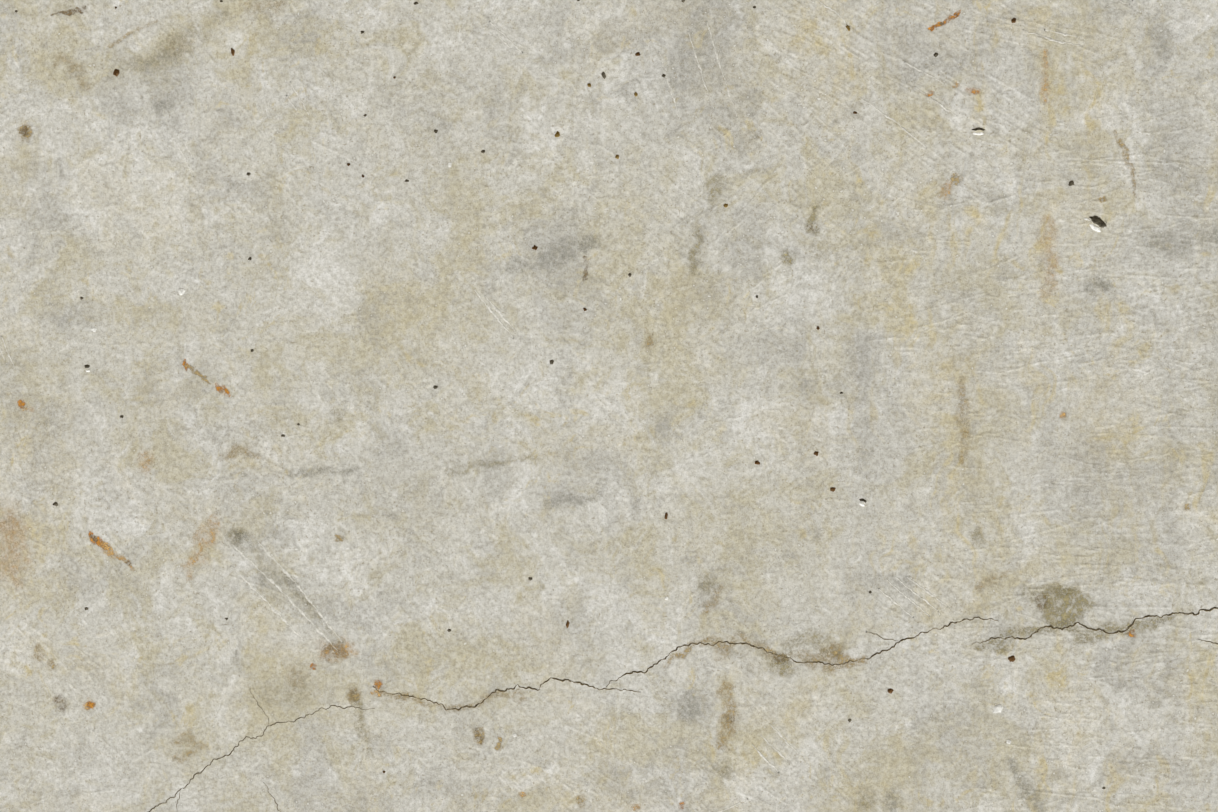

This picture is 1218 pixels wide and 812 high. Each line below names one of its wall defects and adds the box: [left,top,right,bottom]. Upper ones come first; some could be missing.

rust [182,359,230,397]
rust [88,531,132,568]
damp [1029,585,1093,626]
crack [146,606,1218,812]